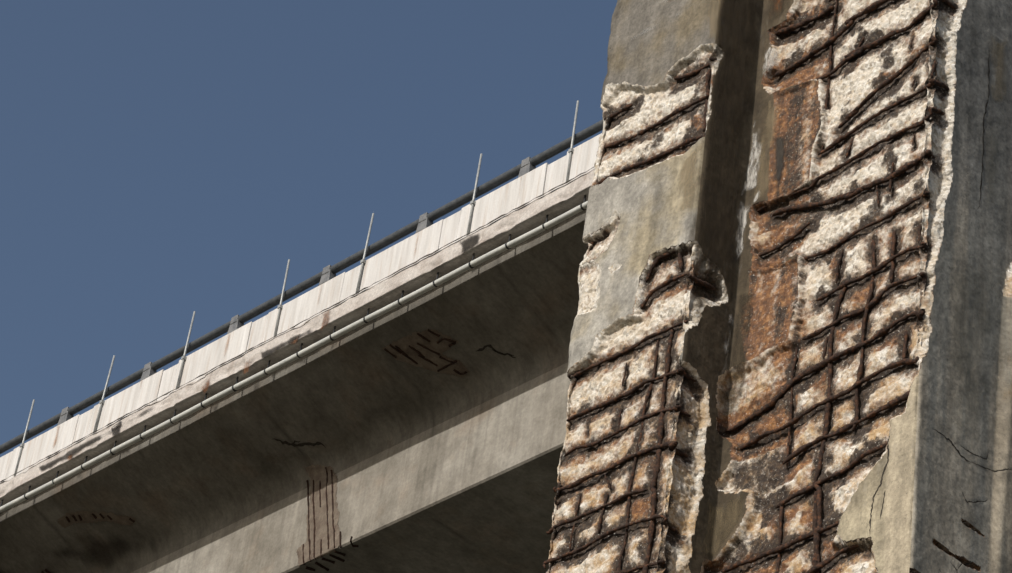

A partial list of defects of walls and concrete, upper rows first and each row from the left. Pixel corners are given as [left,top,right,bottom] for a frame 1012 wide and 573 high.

rust [760,80,821,201]
crack [0,167,594,482]
spalling [543,0,967,573]
rust [741,256,798,361]
crack [935,429,1012,472]
spalling [932,538,981,572]
spalling [961,518,985,538]